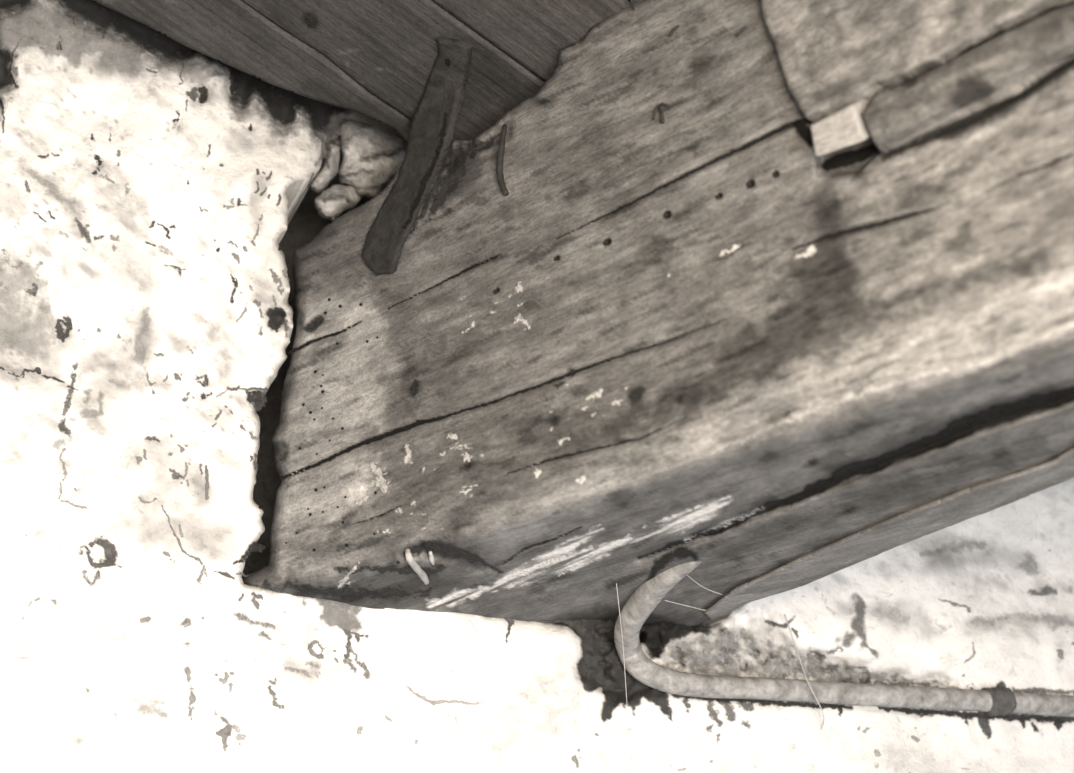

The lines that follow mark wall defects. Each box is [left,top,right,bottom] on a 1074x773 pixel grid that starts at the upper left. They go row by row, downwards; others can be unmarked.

spalling [230,269,289,337]
spalling [246,390,267,411]
crack [280,321,710,480]
spalling [645,622,913,686]